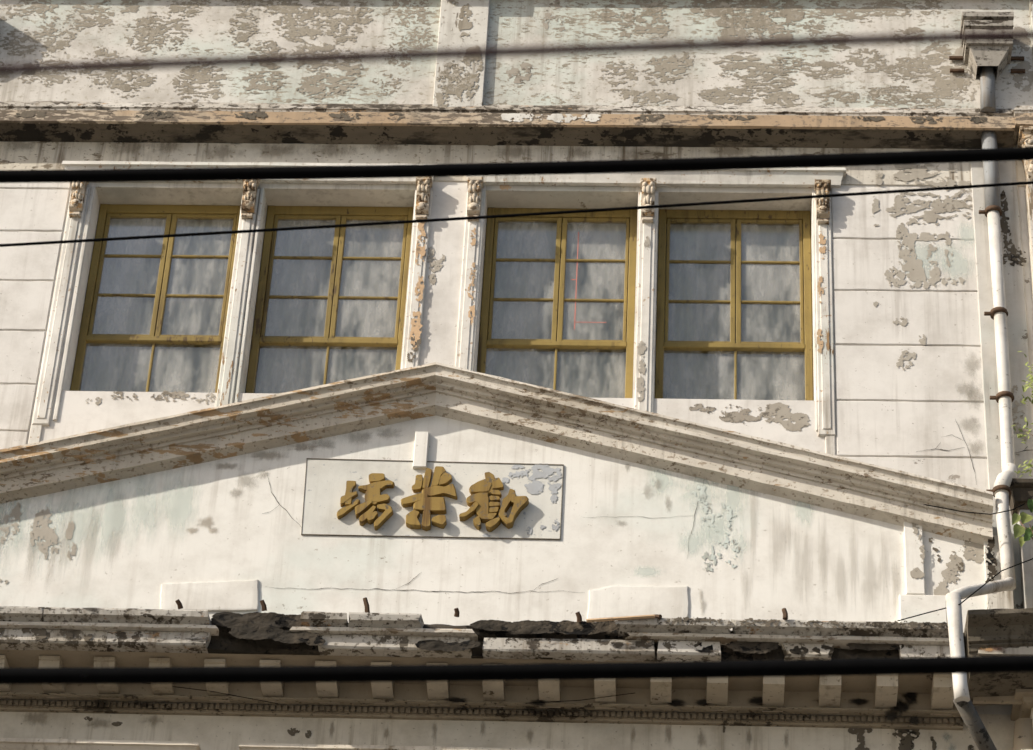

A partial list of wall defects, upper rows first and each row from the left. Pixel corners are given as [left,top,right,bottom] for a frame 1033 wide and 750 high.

peeling [0,0,437,102]
peeling [435,0,483,107]
peeling [501,113,601,123]
peeling [599,51,695,121]
peeling [689,0,987,124]
peeling [872,164,973,289]
peeling [1000,190,1027,266]
peeling [407,222,445,362]
peeling [689,402,810,431]
flaking render [910,523,997,596]
flaking render [211,612,326,645]
flaking render [415,620,619,651]